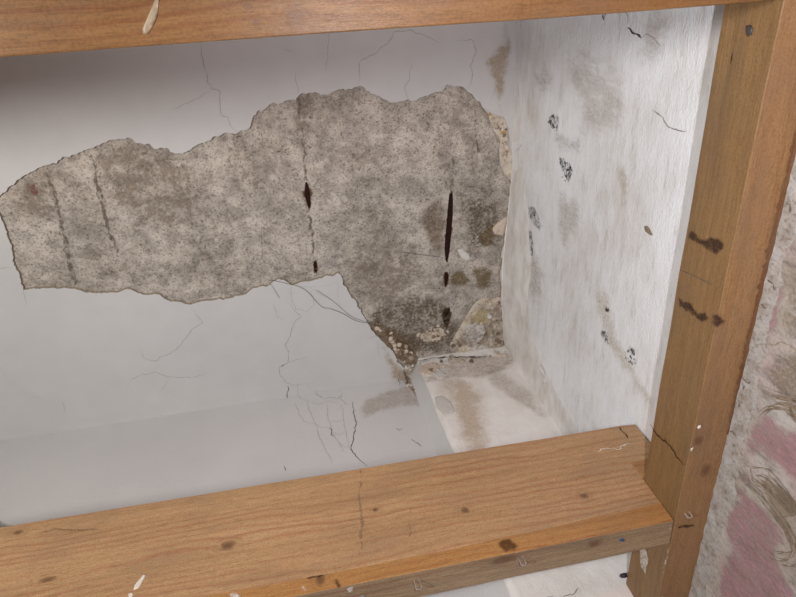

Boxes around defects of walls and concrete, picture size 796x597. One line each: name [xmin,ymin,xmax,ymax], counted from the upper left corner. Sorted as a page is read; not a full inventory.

rust [303,182,312,208]
spalling [0,85,512,397]
rust [425,191,453,262]
water stain [467,199,497,244]
rust [443,269,490,287]
rust [442,307,452,328]
crack [274,284,367,466]